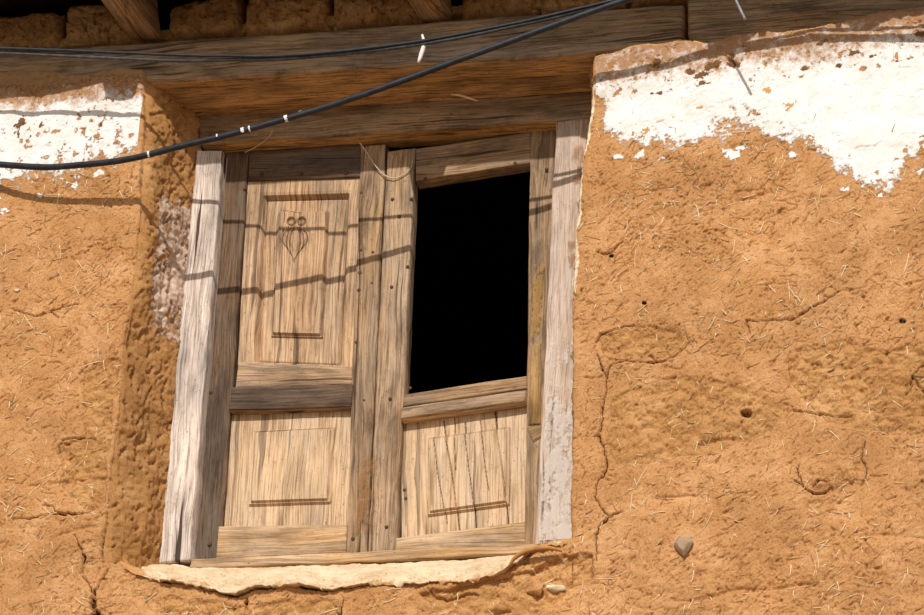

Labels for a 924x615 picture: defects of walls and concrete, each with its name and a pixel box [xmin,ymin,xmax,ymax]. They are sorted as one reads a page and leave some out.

peeling [0,75,146,215]
peeling [571,10,924,305]
peeling [539,394,573,540]
crack [594,326,690,561]
spalling [600,326,688,361]
spalling [607,376,790,465]
crack [746,294,836,333]
crack [794,466,832,495]
spalling [788,340,924,435]
crack [13,506,117,615]